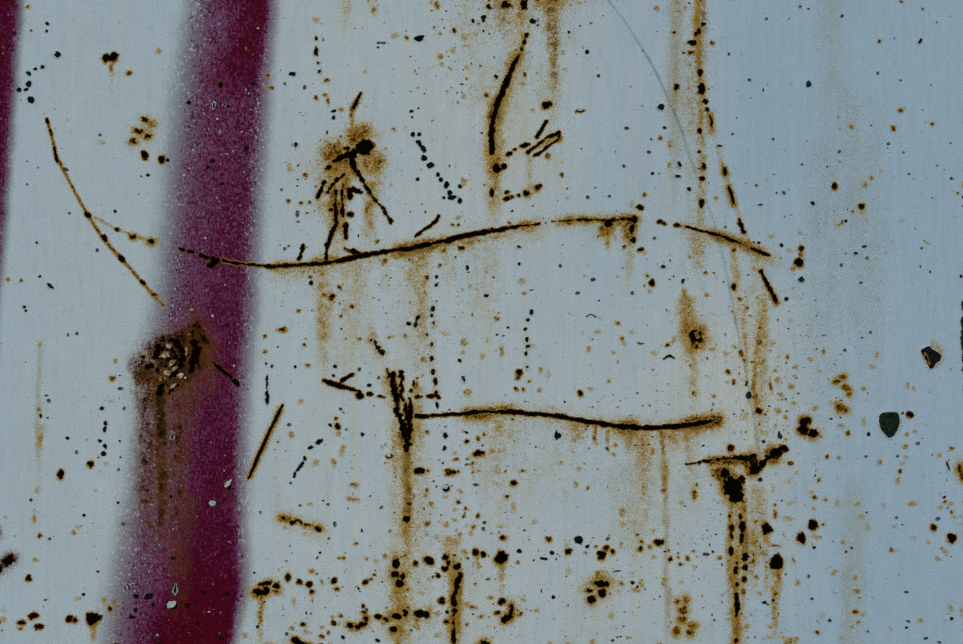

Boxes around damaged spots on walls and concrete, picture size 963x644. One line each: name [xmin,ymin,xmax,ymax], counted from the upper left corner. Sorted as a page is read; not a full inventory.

rust [486,0,578,107]
rust [286,78,394,261]
rust [671,0,822,644]
peeling [920,345,943,370]
rust [129,315,240,570]
rust [830,372,866,437]
peeling [877,410,915,440]
rust [288,369,486,644]
rust [0,552,18,573]
rust [243,578,282,644]
rust [498,599,539,625]
rust [581,570,644,608]